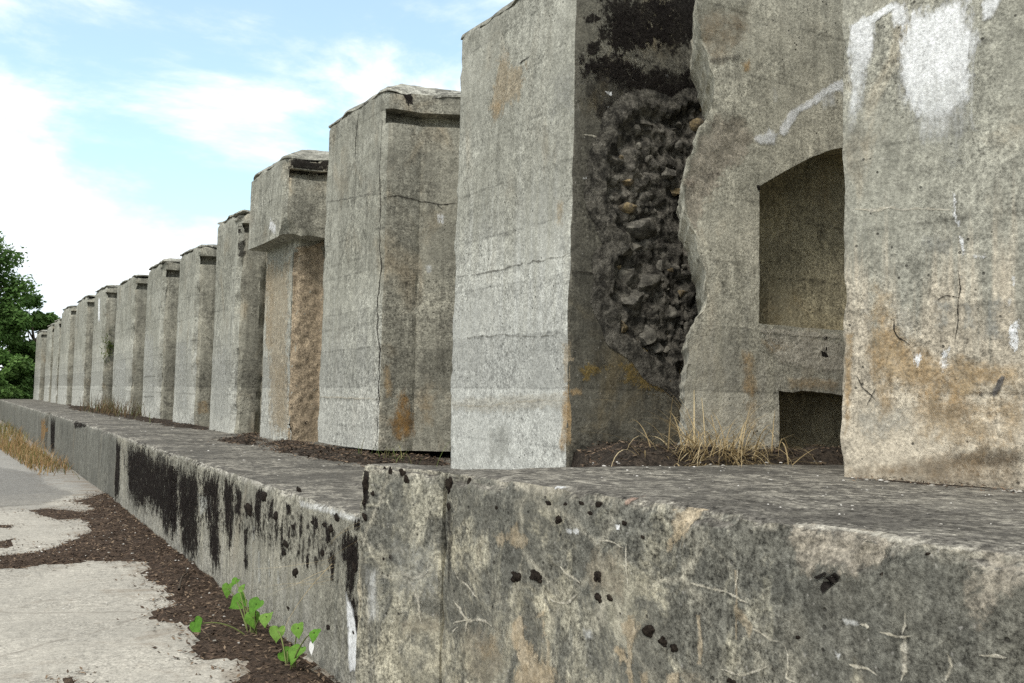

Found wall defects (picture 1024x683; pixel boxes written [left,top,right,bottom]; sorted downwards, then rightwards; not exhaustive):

leakage [755,0,999,144]
spalling [576,10,754,403]
crack [319,115,456,444]
crack [937,271,961,339]
leakage [167,461,178,541]
leakage [243,488,334,584]